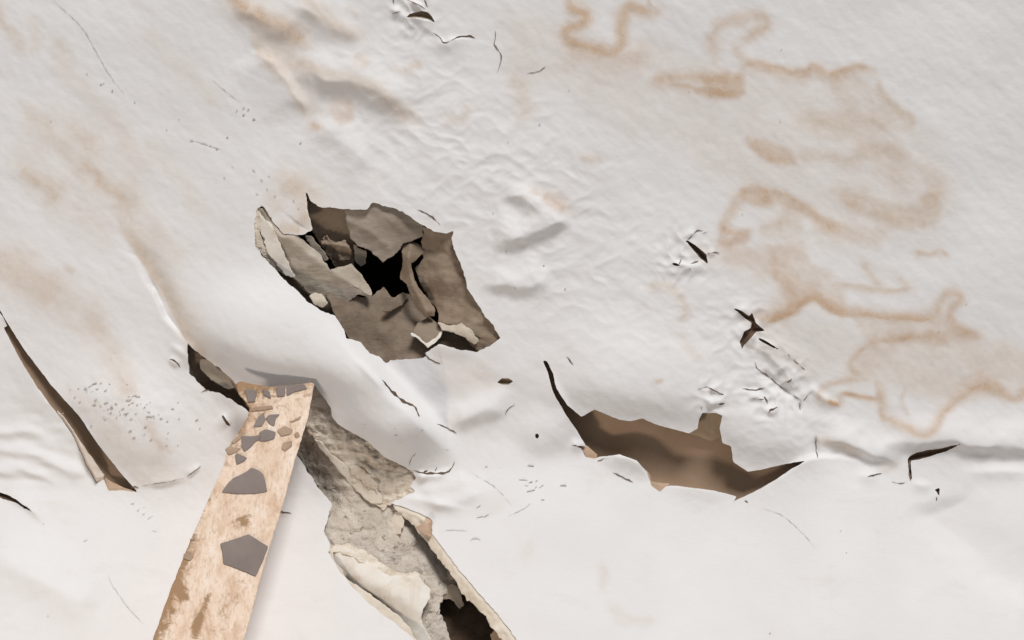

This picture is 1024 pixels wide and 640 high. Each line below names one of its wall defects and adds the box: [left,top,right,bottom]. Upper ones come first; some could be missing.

peeling [70,383,180,446]
flaking render [222,384,307,494]
flaking render [220,534,268,576]
spalling [315,439,516,640]